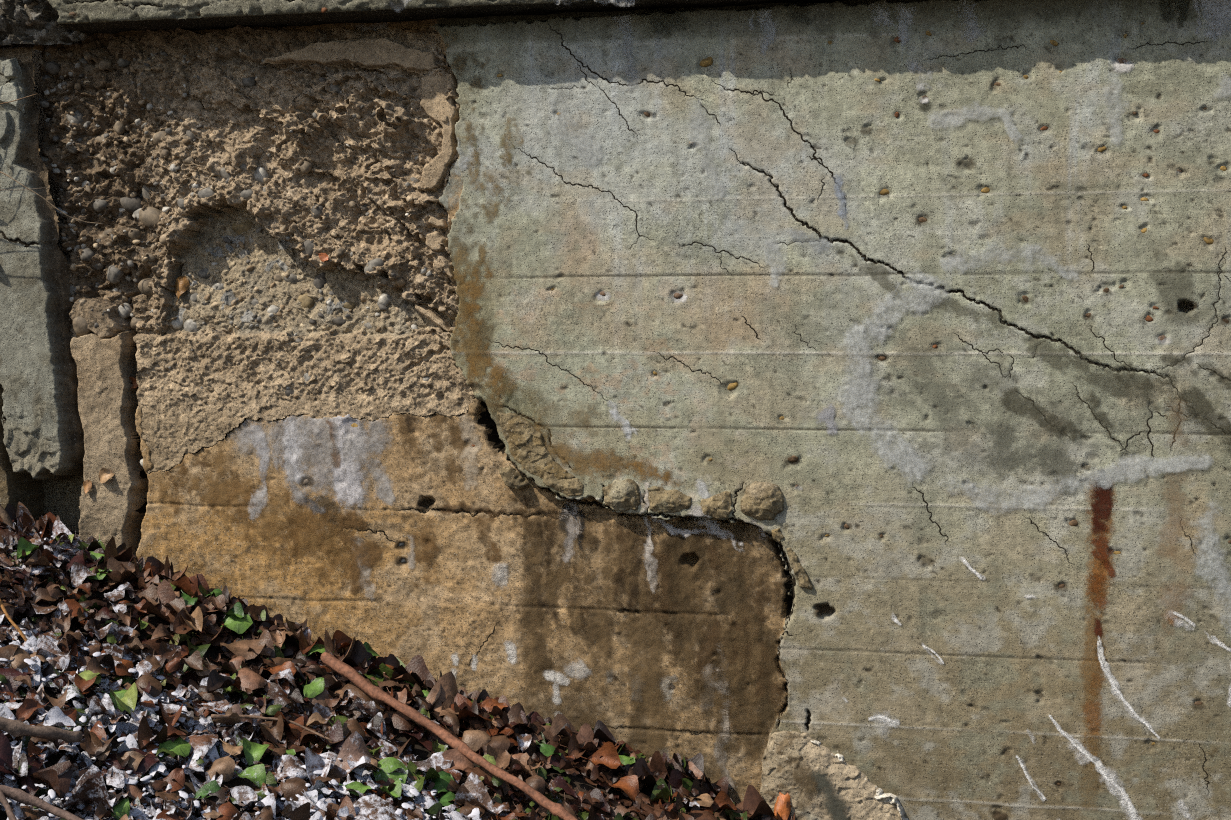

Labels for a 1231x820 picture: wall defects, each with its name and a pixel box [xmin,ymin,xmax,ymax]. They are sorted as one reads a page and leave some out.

spalling [0,0,475,474]
crack [512,21,1231,461]
spalling [673,292,688,302]
crack [490,341,611,403]
damp [160,412,415,599]
spalling [396,542,407,565]
spalling [417,499,434,511]
damp [431,412,783,789]
corrosion [1088,469,1115,637]
efflorescence [1097,636,1159,738]
efflorescence [1016,756,1046,800]
efflorescence [1049,715,1141,820]